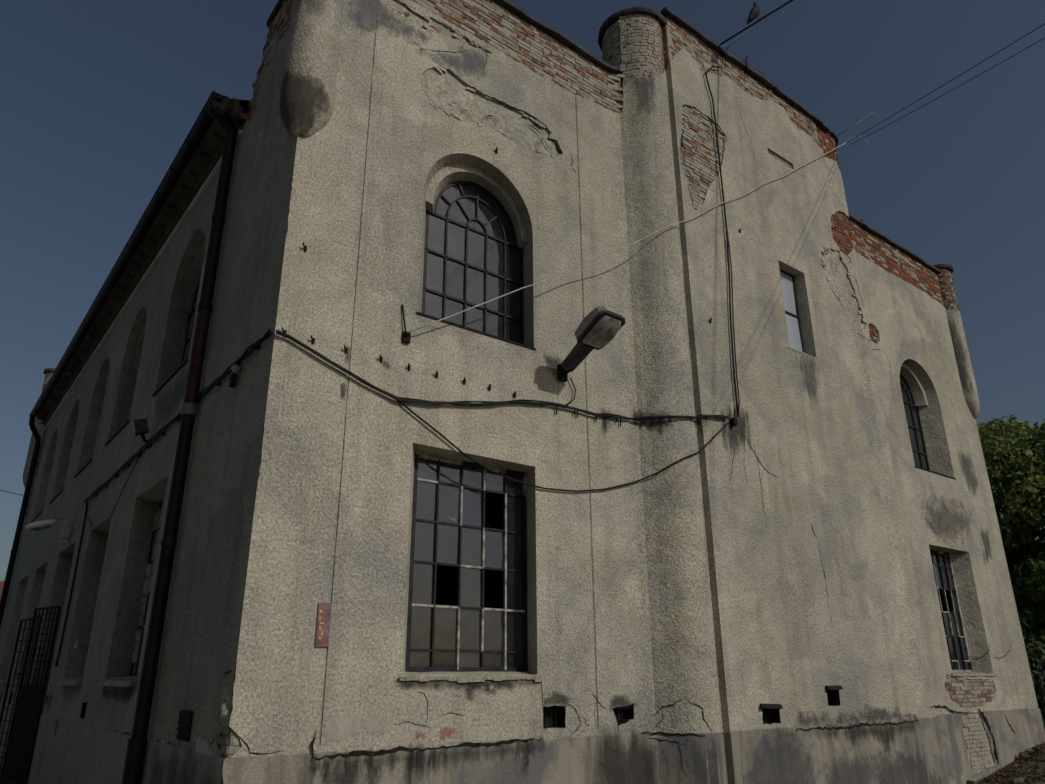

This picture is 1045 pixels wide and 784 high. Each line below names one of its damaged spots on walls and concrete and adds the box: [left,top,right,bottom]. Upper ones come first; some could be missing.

leakage [351,0,426,39]
leakage [279,71,329,137]
flaking render [390,0,841,172]
spalling [679,104,727,210]
flaking render [820,211,945,344]
crack [209,651,282,784]
crack [310,692,543,762]
leakage [598,734,656,784]
crack [642,697,712,776]
leakage [799,709,915,745]
crack [796,705,1015,765]
flaking render [944,674,997,774]